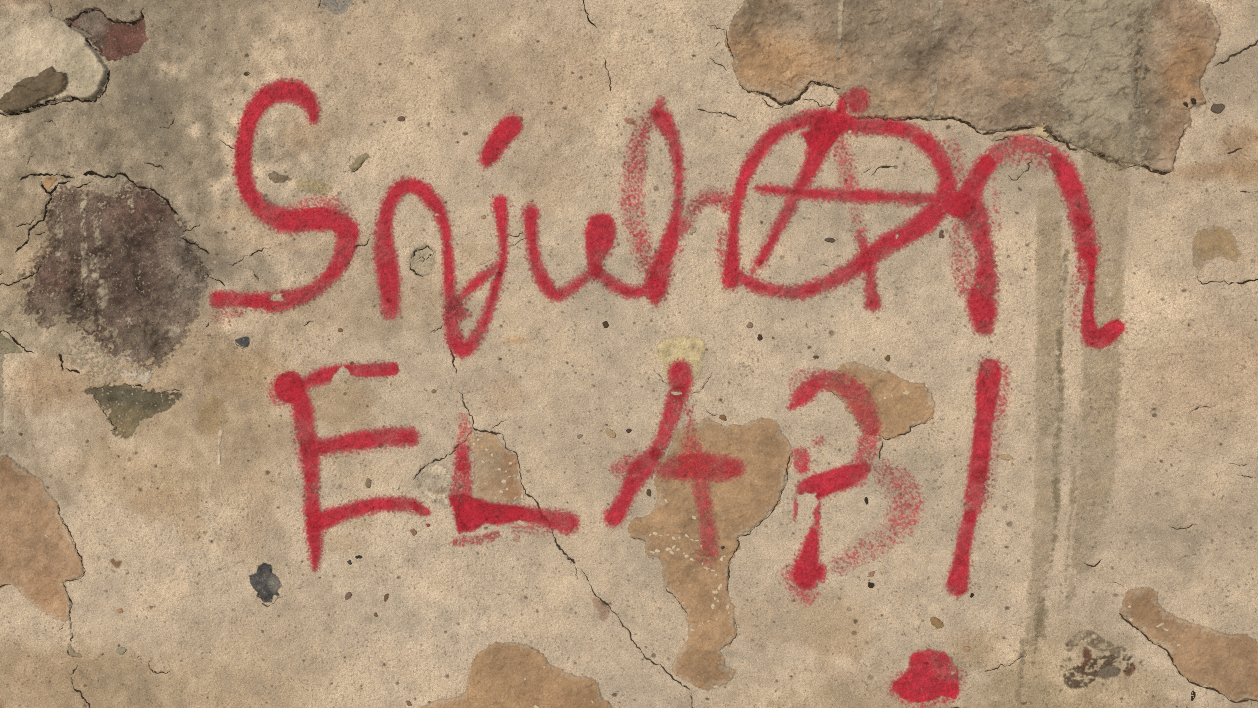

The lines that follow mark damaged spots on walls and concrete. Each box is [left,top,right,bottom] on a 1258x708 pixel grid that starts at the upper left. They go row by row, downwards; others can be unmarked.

flaking render [66,7,149,61]
peeling [725,0,1221,175]
water stain [60,195,151,383]
flaking render [21,176,210,371]
crack [0,154,272,302]
spalling [85,383,182,438]
peeling [825,362,935,440]
peeling [0,455,85,621]
crack [396,289,692,707]
peeling [628,417,792,691]
peeling [420,642,612,708]
peeling [1119,587,1258,703]